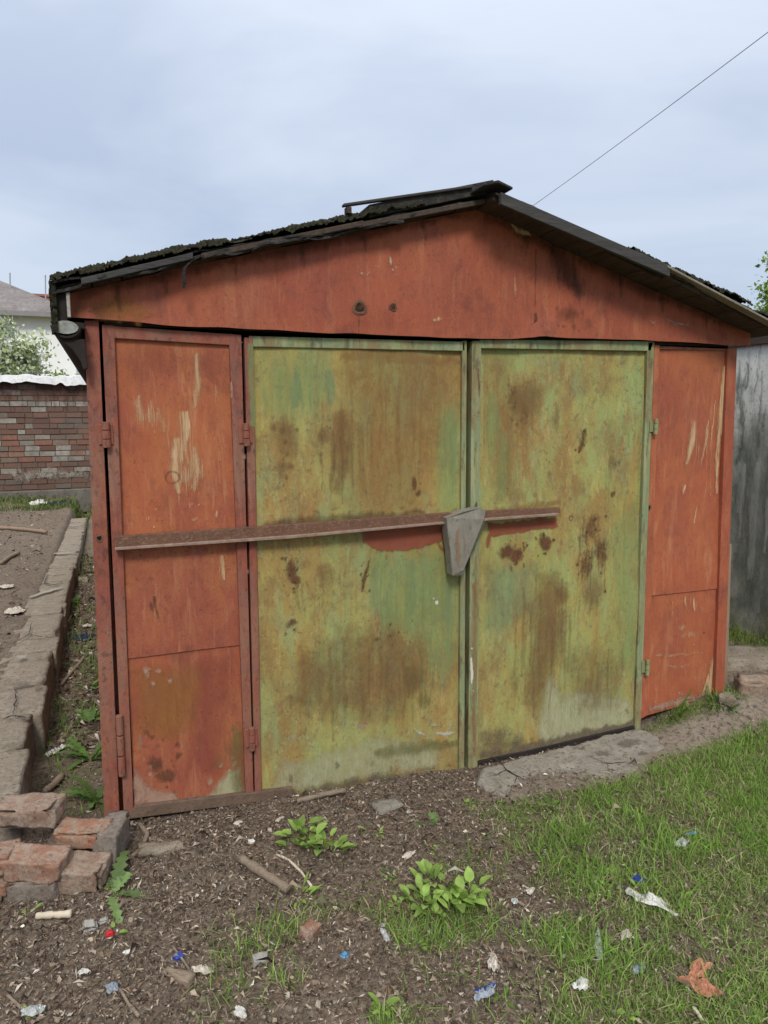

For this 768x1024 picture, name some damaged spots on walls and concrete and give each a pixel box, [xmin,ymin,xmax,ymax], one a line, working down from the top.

peeling [137,353,203,494]
peeling [682,366,725,492]
corrosion [282,557,300,592]
crack [491,756,523,781]